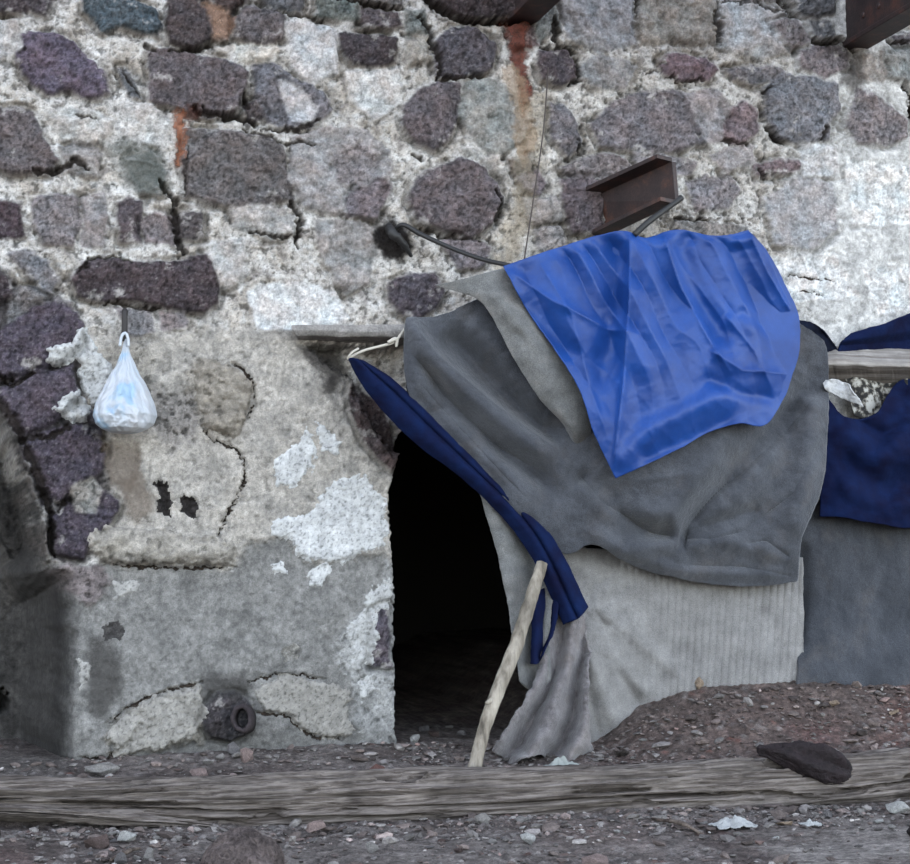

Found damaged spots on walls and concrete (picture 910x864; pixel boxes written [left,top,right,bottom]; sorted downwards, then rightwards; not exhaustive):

rust [498,18,533,117]
crack [900,86,910,119]
rust [173,105,203,167]
crack [234,364,255,418]
peeling [273,421,342,489]
flaking render [152,480,199,519]
crack [203,430,247,535]
peeling [270,473,390,587]
crack [114,683,196,720]
crack [247,673,317,683]
crack [256,712,340,740]